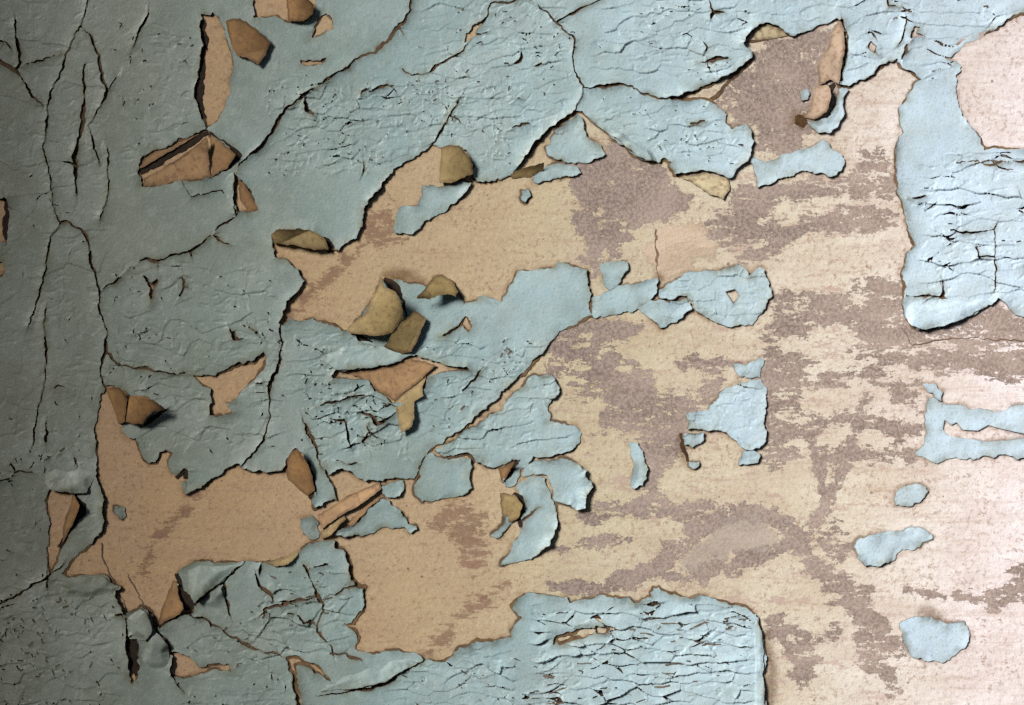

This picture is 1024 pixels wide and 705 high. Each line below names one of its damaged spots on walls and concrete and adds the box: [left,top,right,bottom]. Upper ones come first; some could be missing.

peeling [138,0,333,214]
crack [0,0,768,490]
peeling [271,12,1024,705]
crack [906,261,947,299]
crack [913,188,1021,290]
crack [956,154,1024,170]
peeling [62,385,327,628]
crack [0,542,362,705]
crack [458,613,751,705]